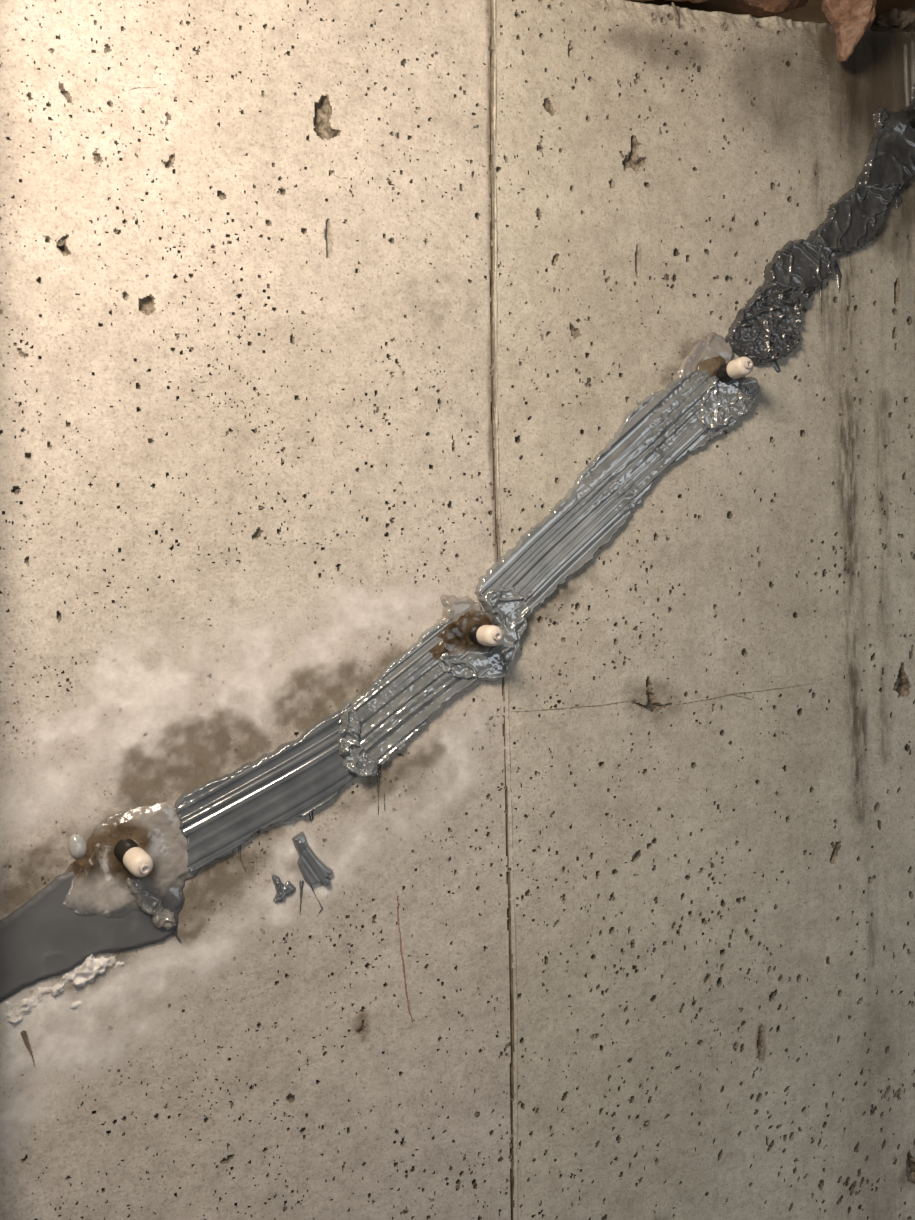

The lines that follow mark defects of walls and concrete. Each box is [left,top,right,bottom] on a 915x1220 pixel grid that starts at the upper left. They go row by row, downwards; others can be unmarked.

damp [819,26,915,144]
crack [0,31,915,1002]
damp [841,406,857,584]
damp [35,590,426,807]
damp [367,732,471,816]
damp [849,663,866,747]
damp [0,847,258,1078]
damp [257,828,367,925]